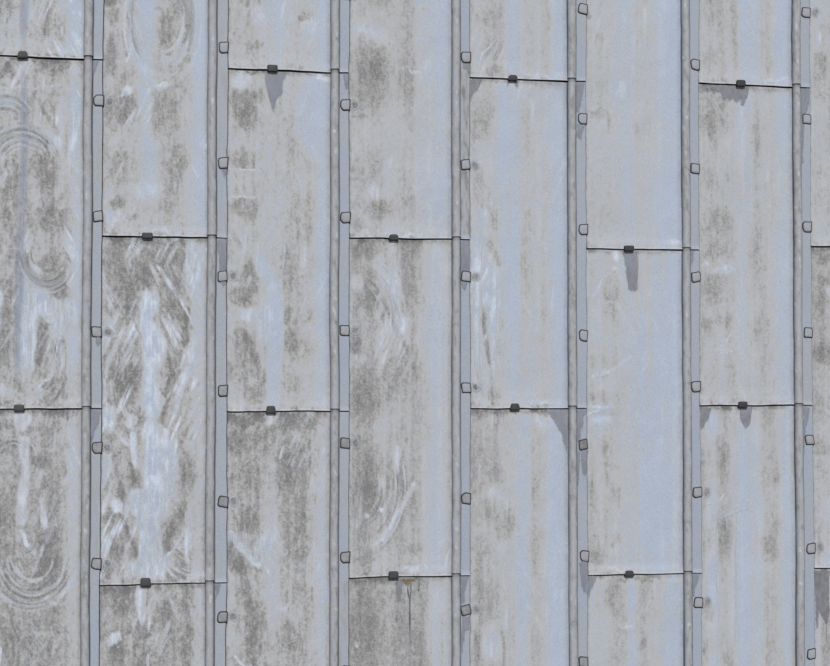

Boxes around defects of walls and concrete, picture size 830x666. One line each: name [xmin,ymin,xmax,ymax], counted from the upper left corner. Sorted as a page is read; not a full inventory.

leakage [265,72,285,108]
leakage [707,84,749,106]
leakage [623,250,638,291]
leakage [546,409,586,449]
leakage [814,570,829,640]